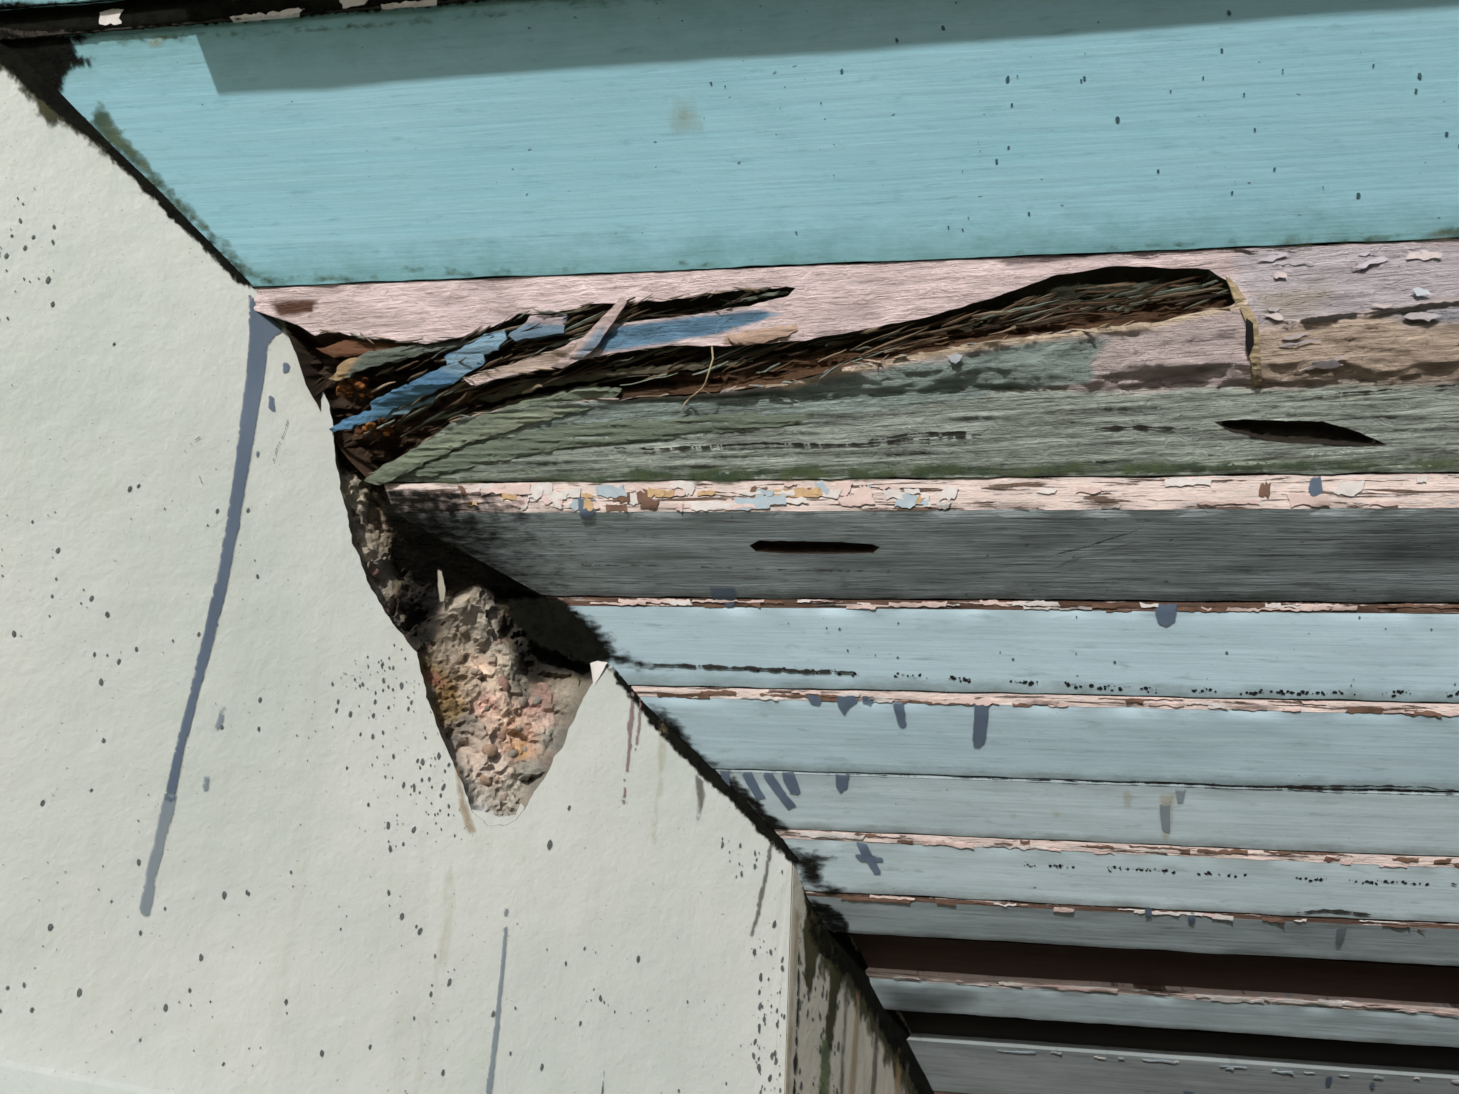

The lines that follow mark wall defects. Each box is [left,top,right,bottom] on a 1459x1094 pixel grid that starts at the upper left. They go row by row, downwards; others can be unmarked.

peeling [1353,249,1443,269]
peeling [1371,287,1441,322]
peeling [1265,307,1320,347]
crack [614,431,981,450]
crack [1084,423,1197,431]
peeling [458,480,958,512]
peeling [1165,477,1399,507]
spalling [324,392,607,826]
peeling [656,690,1069,707]
peeling [1098,696,1327,712]
peeling [1346,707,1459,718]
water stain [383,489,934,1094]